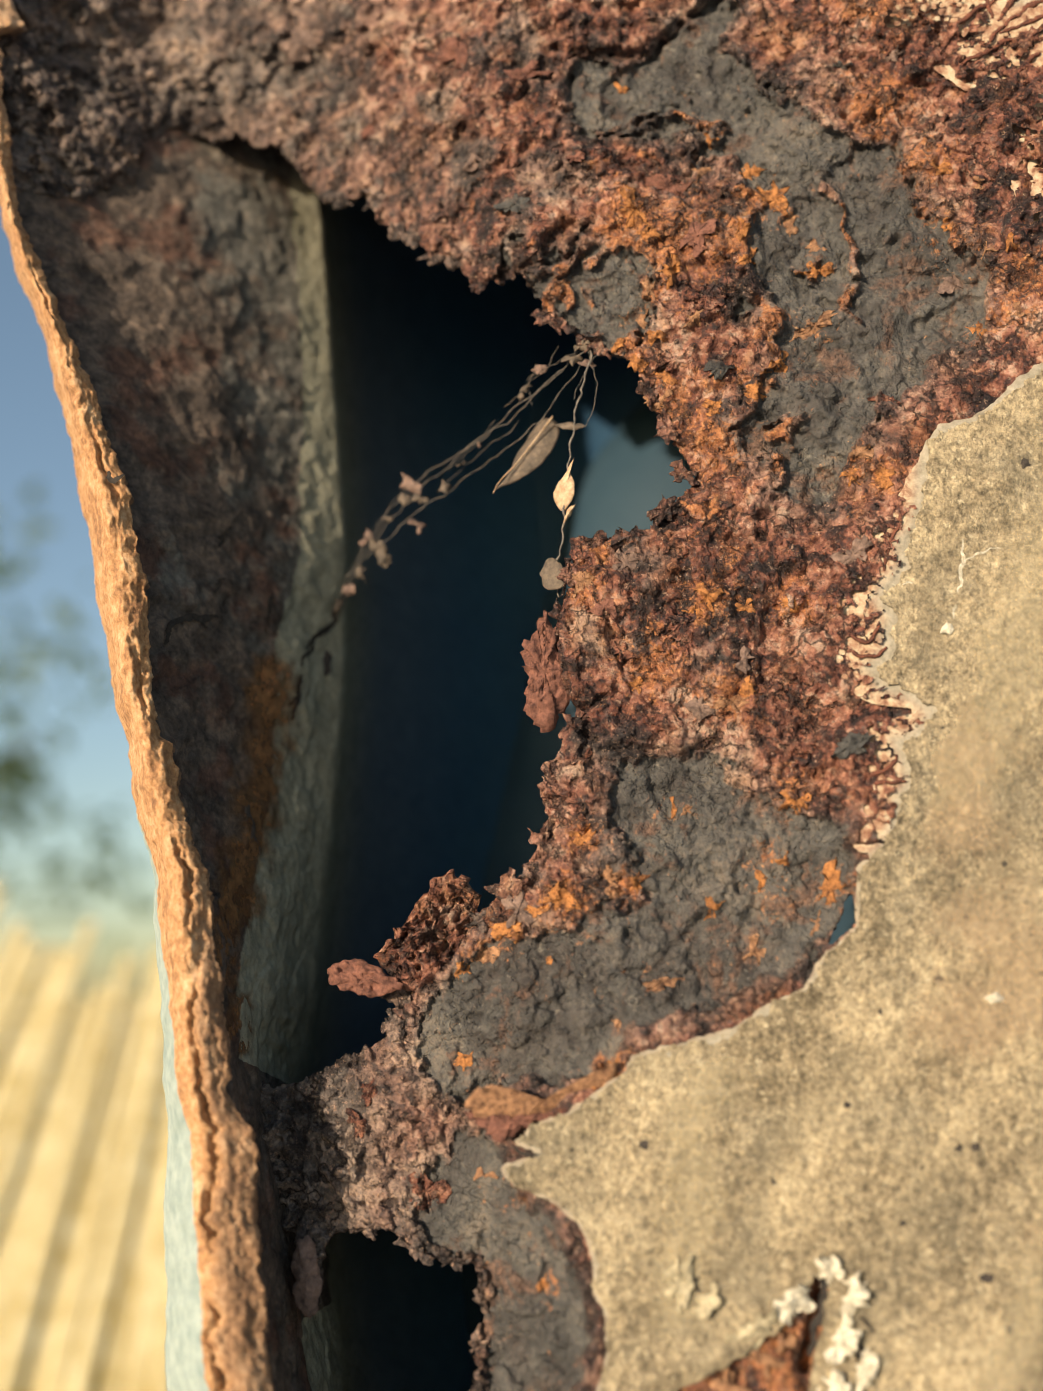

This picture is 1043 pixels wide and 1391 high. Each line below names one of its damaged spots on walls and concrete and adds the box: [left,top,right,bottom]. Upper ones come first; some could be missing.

peeling [0,0,27,36]
spalling [521,275,590,431]
spalling [533,349,692,568]
peeling [0,70,275,1391]
spalling [483,696,567,886]
corrosion [520,610,570,733]
corrosion [214,863,252,1055]
corrosion [327,869,482,998]
corrosion [461,1061,618,1142]
corrosion [290,1235,323,1318]
spalling [662,1255,721,1320]
spalling [677,1255,880,1391]